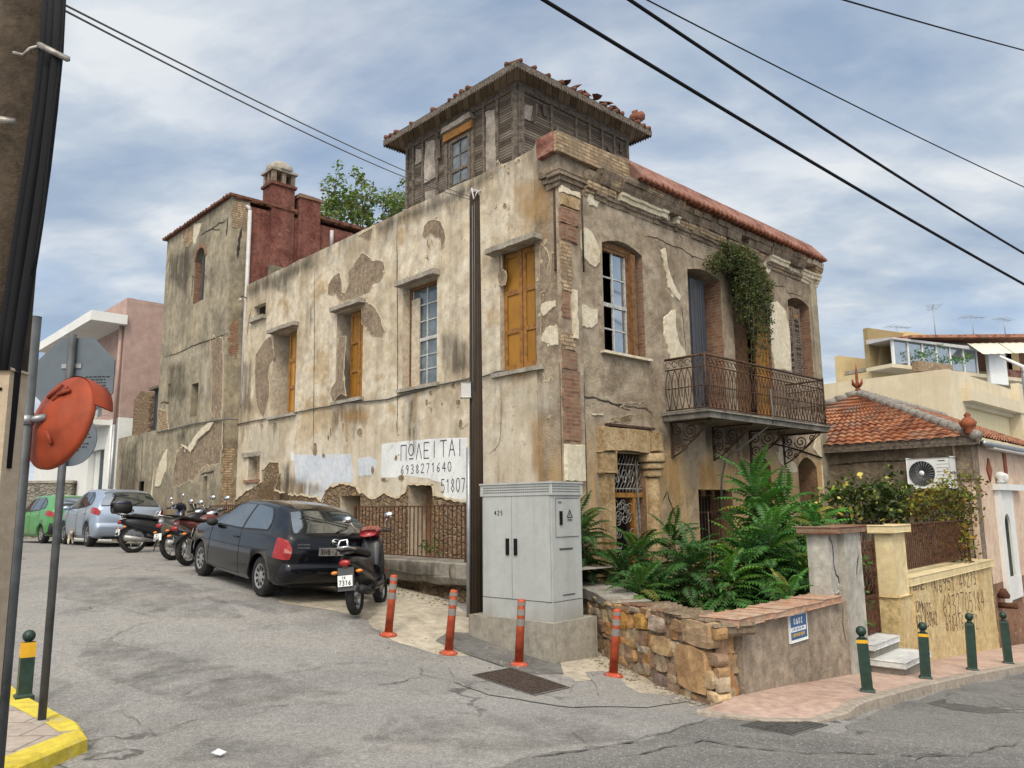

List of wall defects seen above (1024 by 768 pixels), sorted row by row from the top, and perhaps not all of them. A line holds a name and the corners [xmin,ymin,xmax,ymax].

crack [200,218,242,259]
peeling [422,215,446,250]
peeling [580,228,601,268]
peeling [328,253,386,341]
peeling [541,300,558,347]
peeling [660,248,686,358]
peeling [151,318,239,513]
peeling [254,336,277,434]
crack [585,396,652,414]
spalling [371,454,404,482]